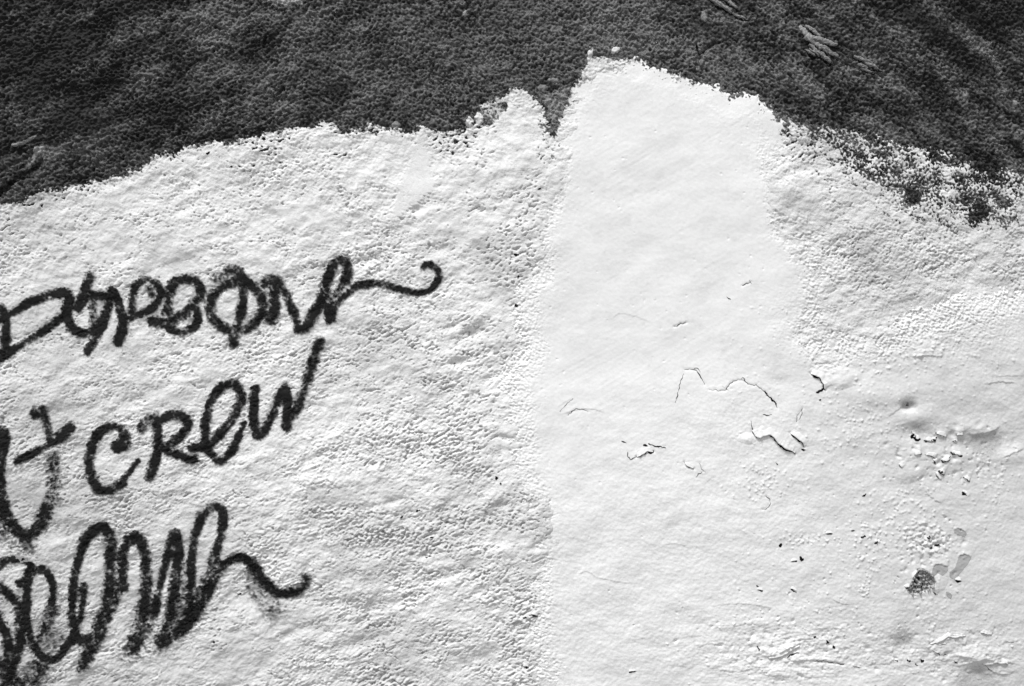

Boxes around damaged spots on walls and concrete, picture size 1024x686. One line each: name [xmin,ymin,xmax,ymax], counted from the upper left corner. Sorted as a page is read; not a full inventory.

crack [675,368,828,454]
peeling [910,431,963,480]
spalling [904,554,971,599]